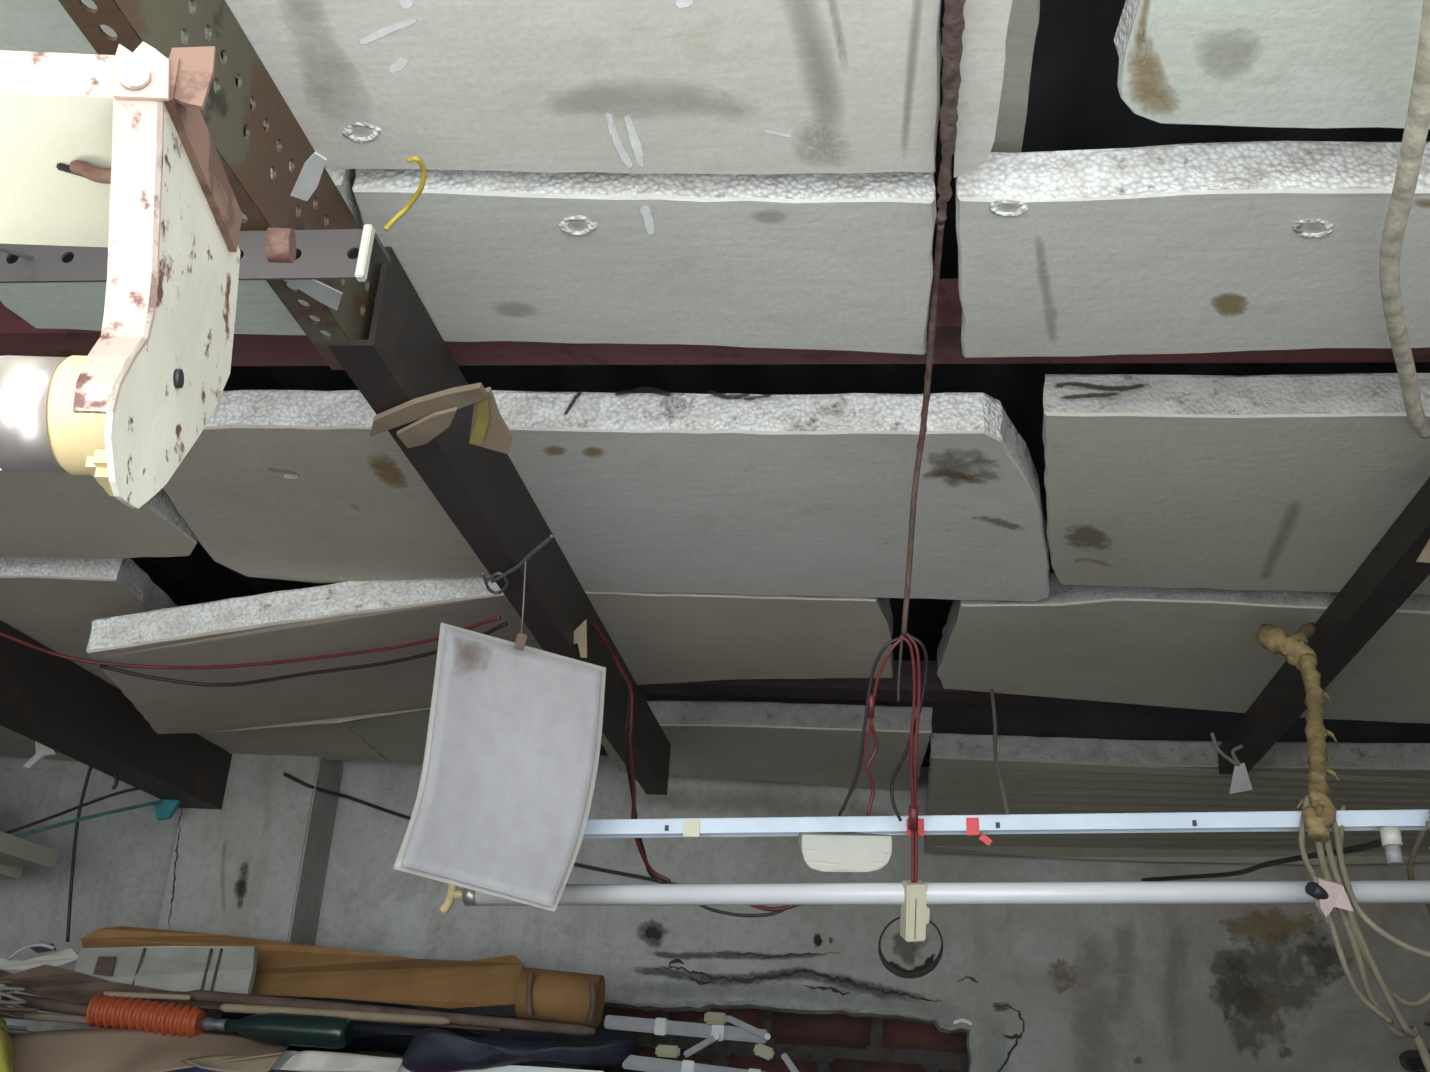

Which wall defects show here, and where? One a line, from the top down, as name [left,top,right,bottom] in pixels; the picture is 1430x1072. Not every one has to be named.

damp [1216,295,1243,313]
spalling [567,998,975,1072]
crack [643,950,1025,1072]